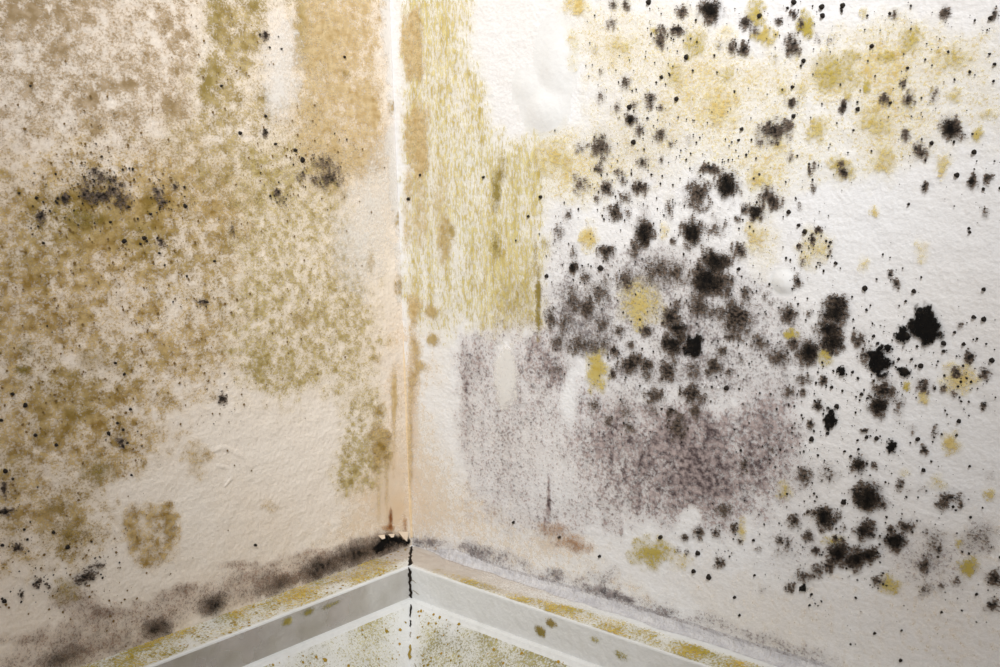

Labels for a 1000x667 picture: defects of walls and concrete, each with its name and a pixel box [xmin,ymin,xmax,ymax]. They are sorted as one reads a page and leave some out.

leakage [0,0,408,667]
crack [408,546,429,667]
leakage [395,0,1000,615]